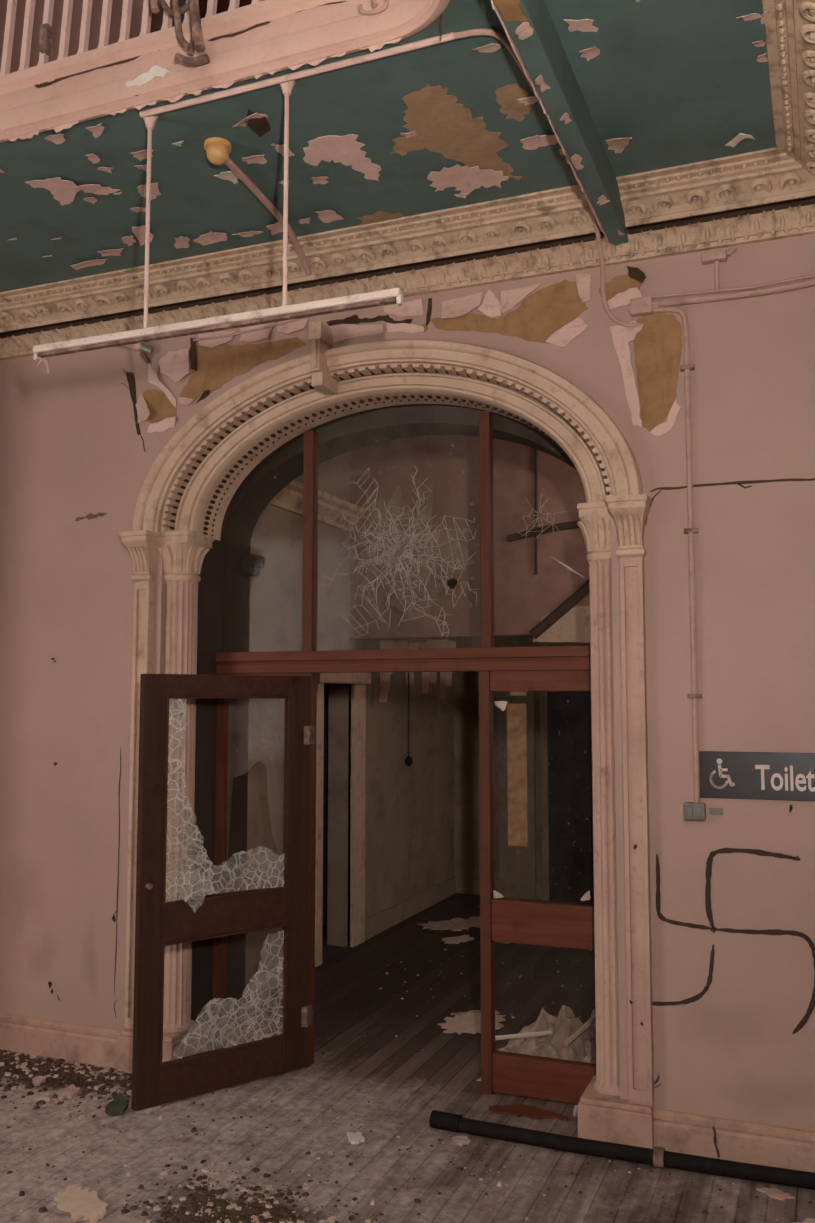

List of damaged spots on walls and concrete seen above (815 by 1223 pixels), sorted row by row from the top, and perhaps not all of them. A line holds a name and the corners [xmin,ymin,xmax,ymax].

peeling [25,153,122,206]
peeling [86,123,104,138]
peeling [70,149,161,270]
peeling [214,171,239,184]
peeling [174,222,283,249]
peeling [233,110,381,184]
peeling [298,210,343,224]
peeling [391,0,625,243]
peeling [725,133,755,148]
peeling [326,266,646,347]
peeling [126,317,309,435]
peeling [609,312,682,436]